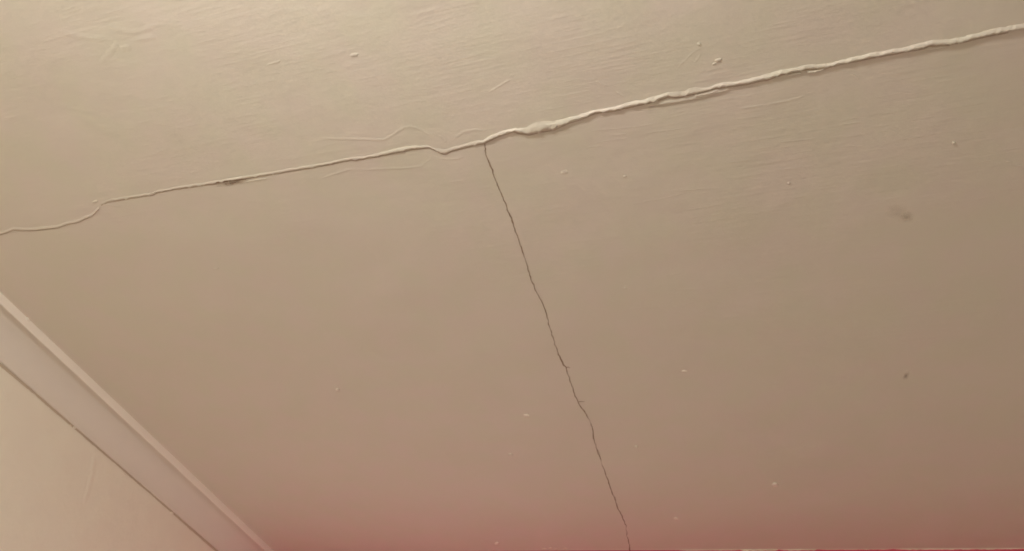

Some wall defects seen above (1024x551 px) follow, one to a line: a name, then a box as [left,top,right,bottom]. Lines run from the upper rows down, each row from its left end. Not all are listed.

crack [101,23,1024,208]
crack [0,206,99,235]
crack [484,143,632,550]
crack [0,363,218,551]